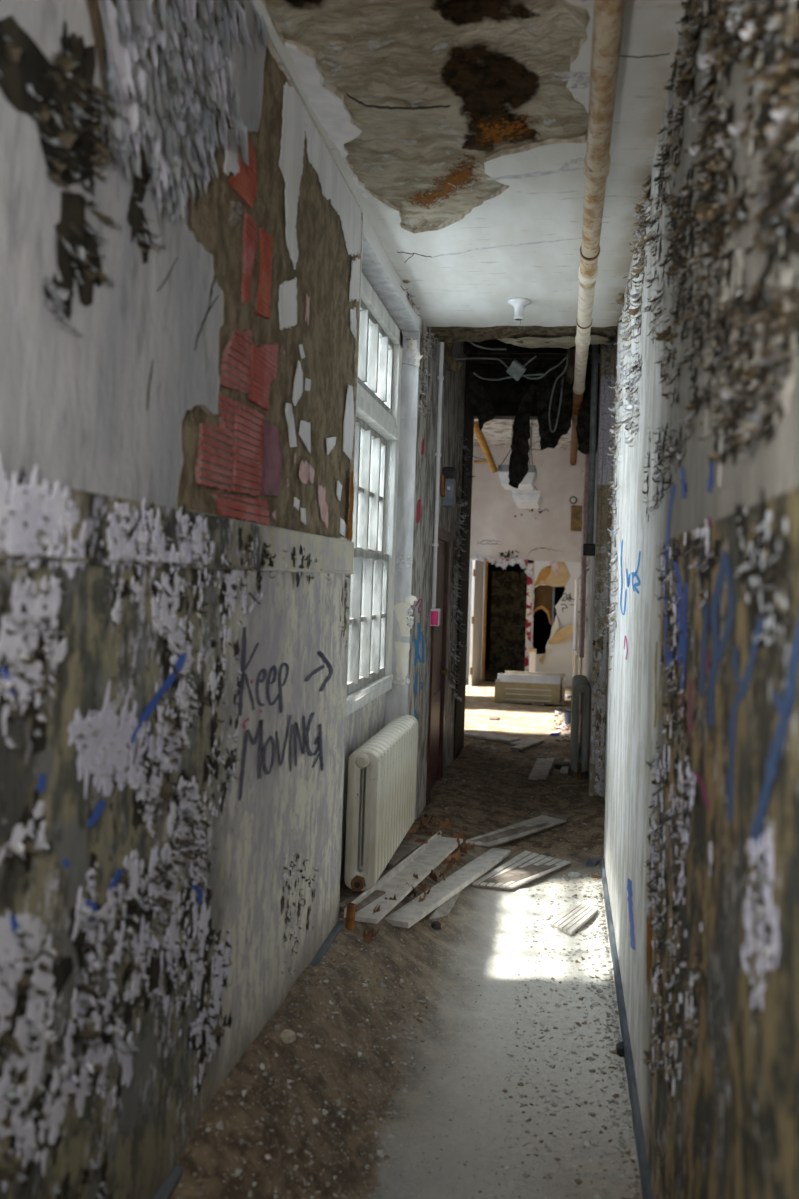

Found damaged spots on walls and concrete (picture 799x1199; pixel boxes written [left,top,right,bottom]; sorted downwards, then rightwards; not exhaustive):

spalling [0,0,590,1199]
rust [409,114,538,209]
water stain [441,45,539,152]
peeling [400,0,799,793]
peeling [642,487,793,1097]